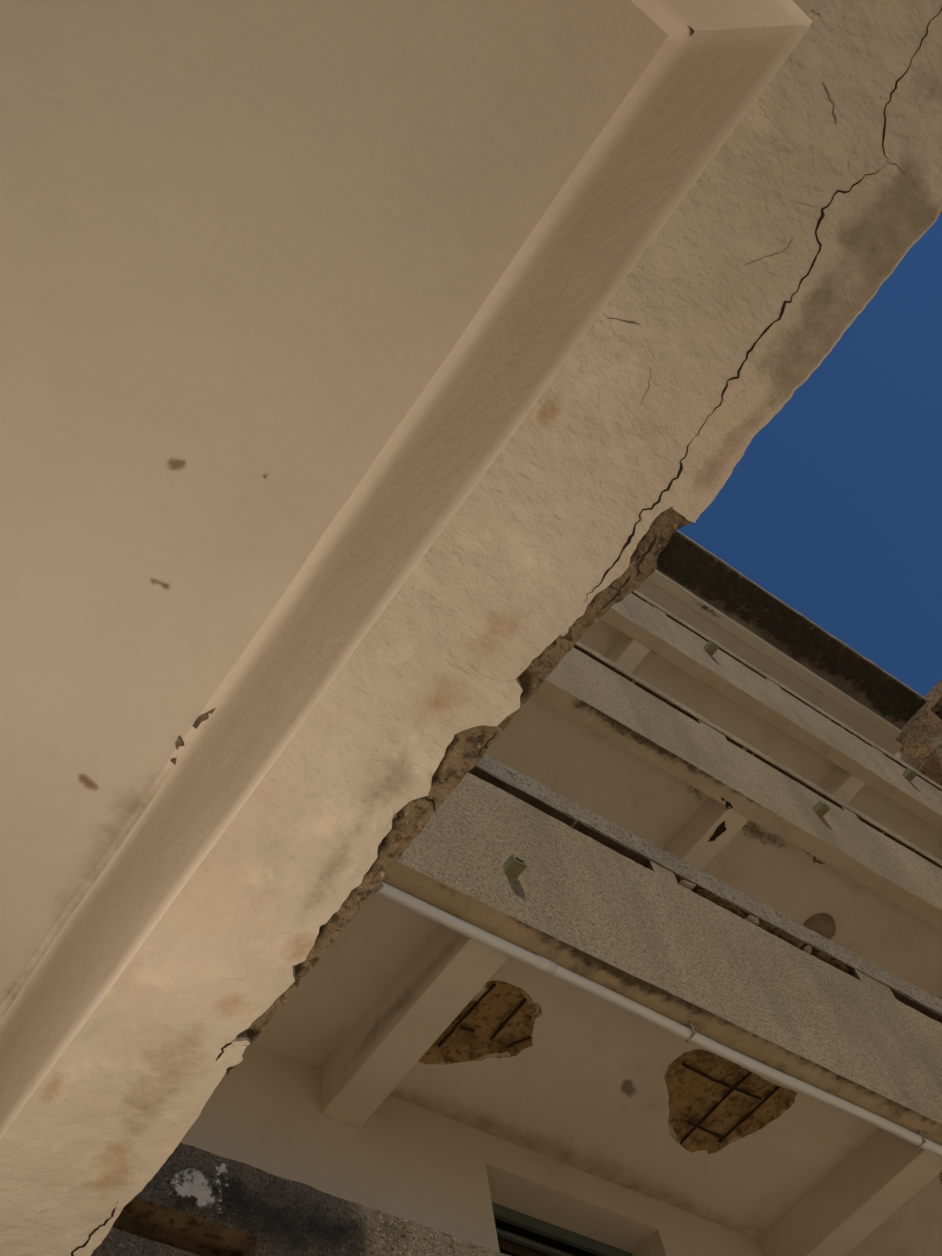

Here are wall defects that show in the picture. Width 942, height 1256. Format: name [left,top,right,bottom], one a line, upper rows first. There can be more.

crack [587,7,942,594]
water stain [781,173,934,388]
water stain [657,534,926,722]
spalling [221,507,691,1067]
spalling [708,797,733,842]
spalling [664,1049,798,1154]
crack [71,1201,118,1256]